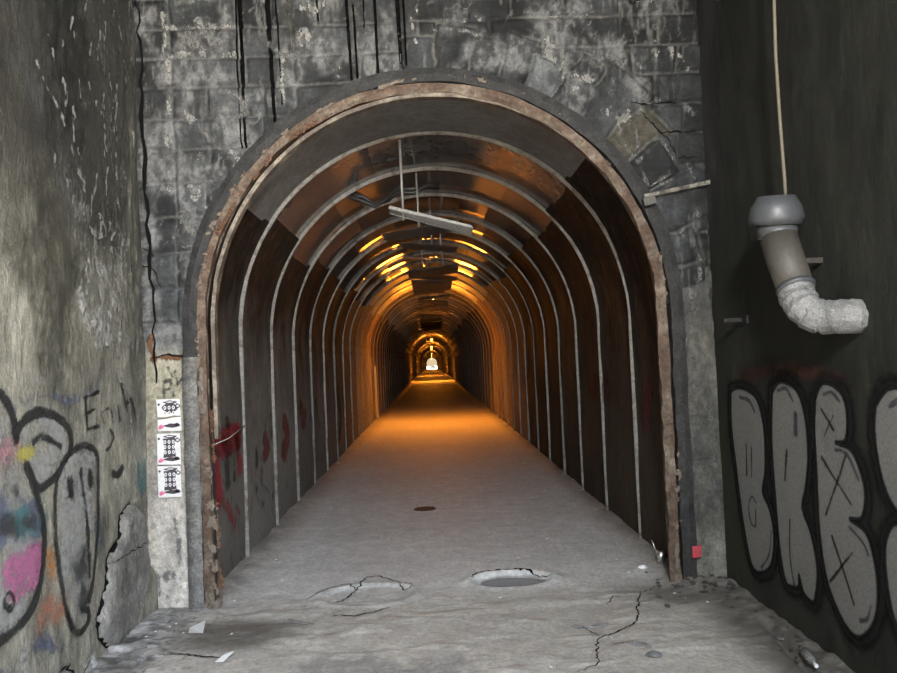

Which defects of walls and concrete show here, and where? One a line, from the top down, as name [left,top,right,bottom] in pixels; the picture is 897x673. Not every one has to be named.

leakage [265,0,325,123]
leakage [337,0,379,81]
crack [632,101,699,158]
crack [134,0,183,383]
crack [60,502,149,673]
crack [582,587,654,670]